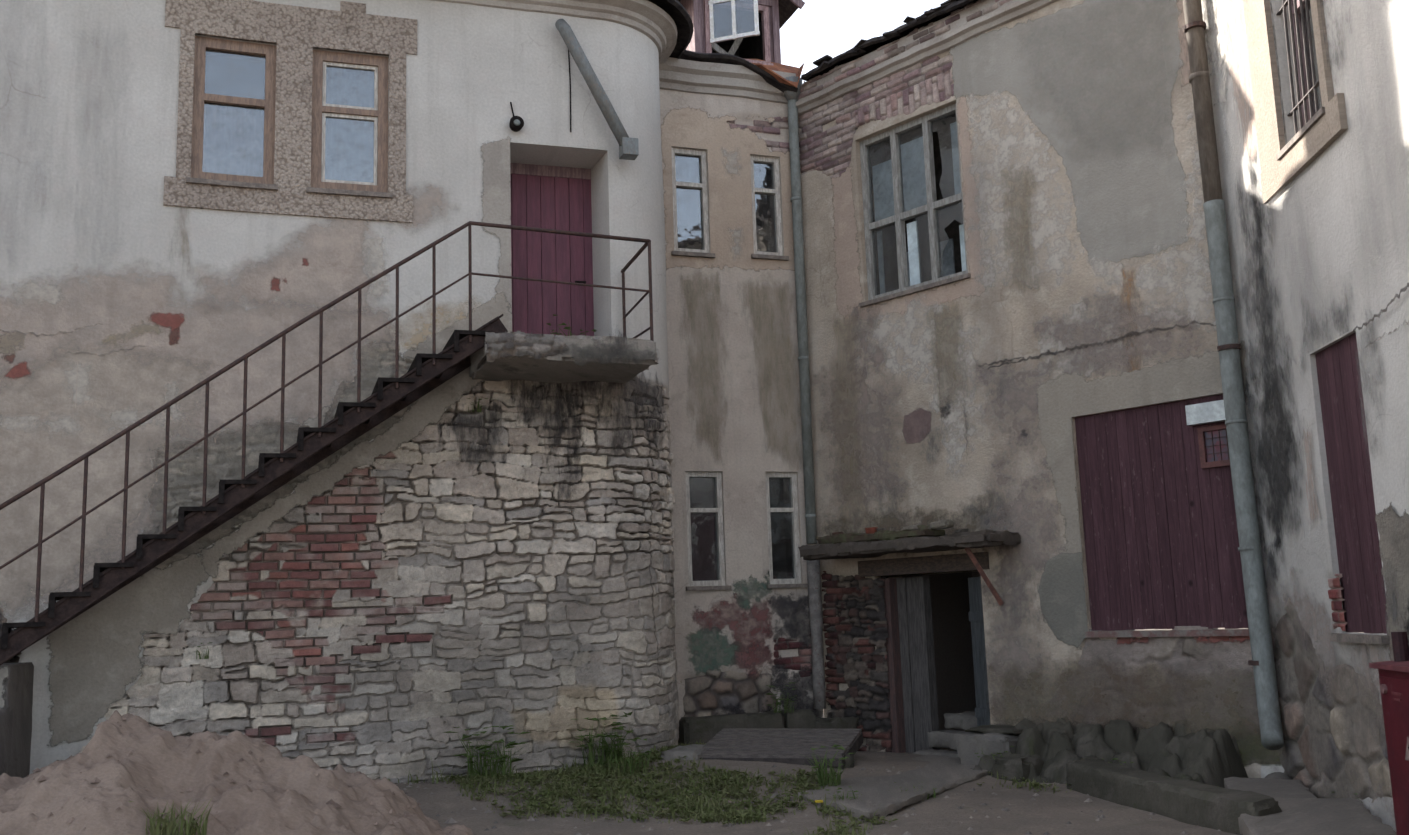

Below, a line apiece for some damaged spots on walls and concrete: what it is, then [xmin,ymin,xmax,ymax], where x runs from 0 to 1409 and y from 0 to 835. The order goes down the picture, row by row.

peeling [1203,0,1259,161]
spalling [727,55,986,325]
peeling [0,137,570,639]
water stain [439,335,665,499]
crack [934,314,1216,456]
water stain [1236,156,1383,691]
crack [1353,282,1409,348]
spalling [47,367,485,747]
flaking render [680,571,893,752]
flaking render [998,598,1393,803]
flaking render [1328,574,1348,631]
spalling [1375,503,1409,661]